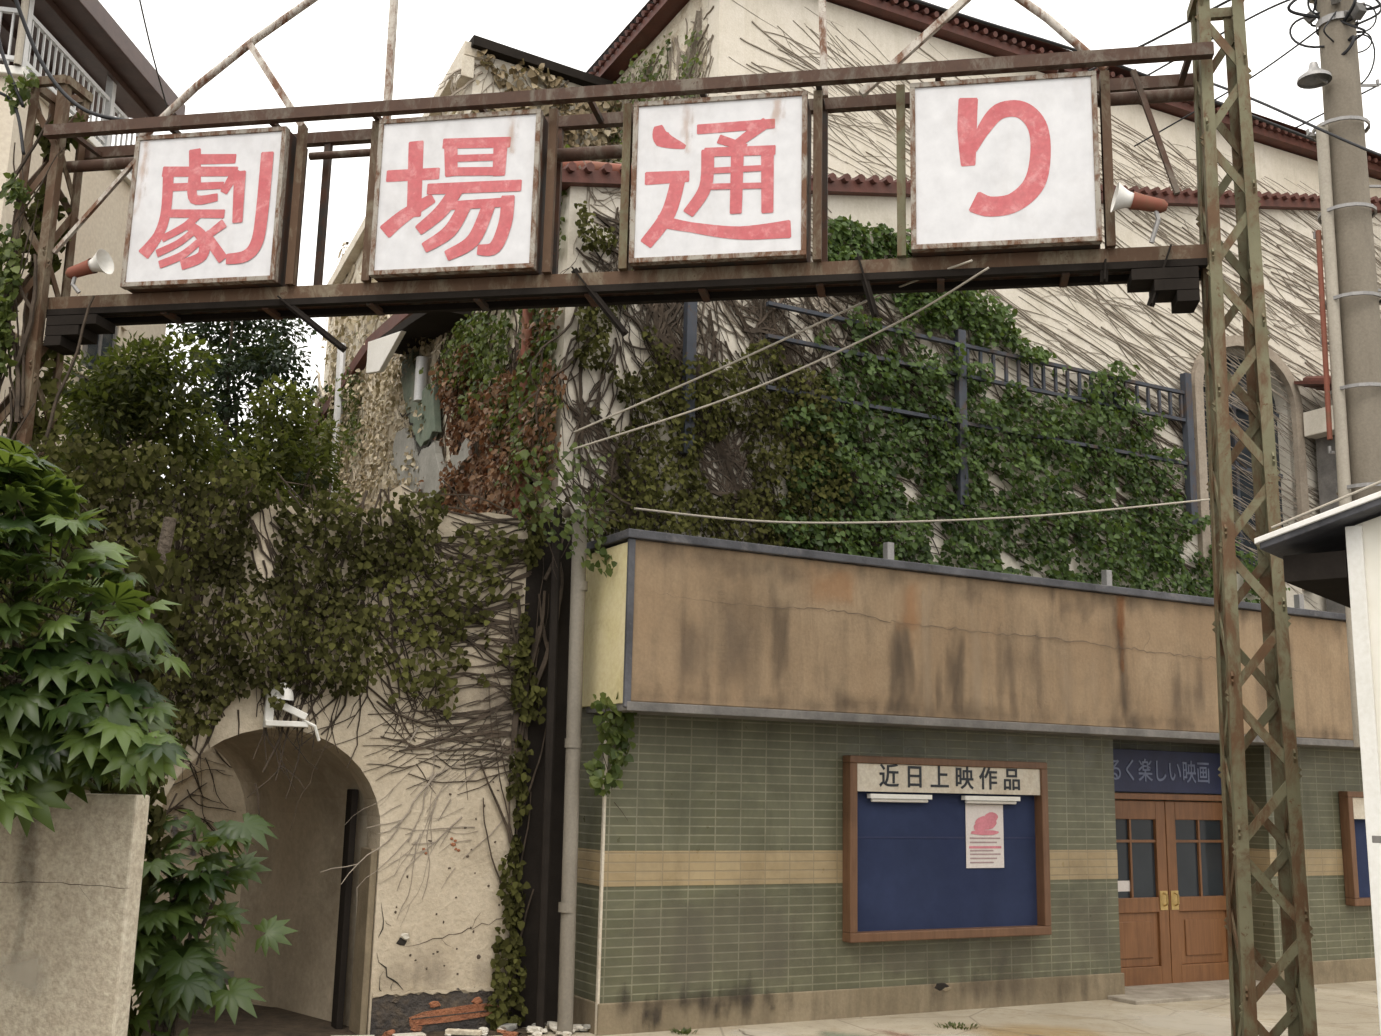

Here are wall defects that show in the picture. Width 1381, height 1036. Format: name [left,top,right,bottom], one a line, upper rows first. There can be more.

flaking render [370,933,507,1036]